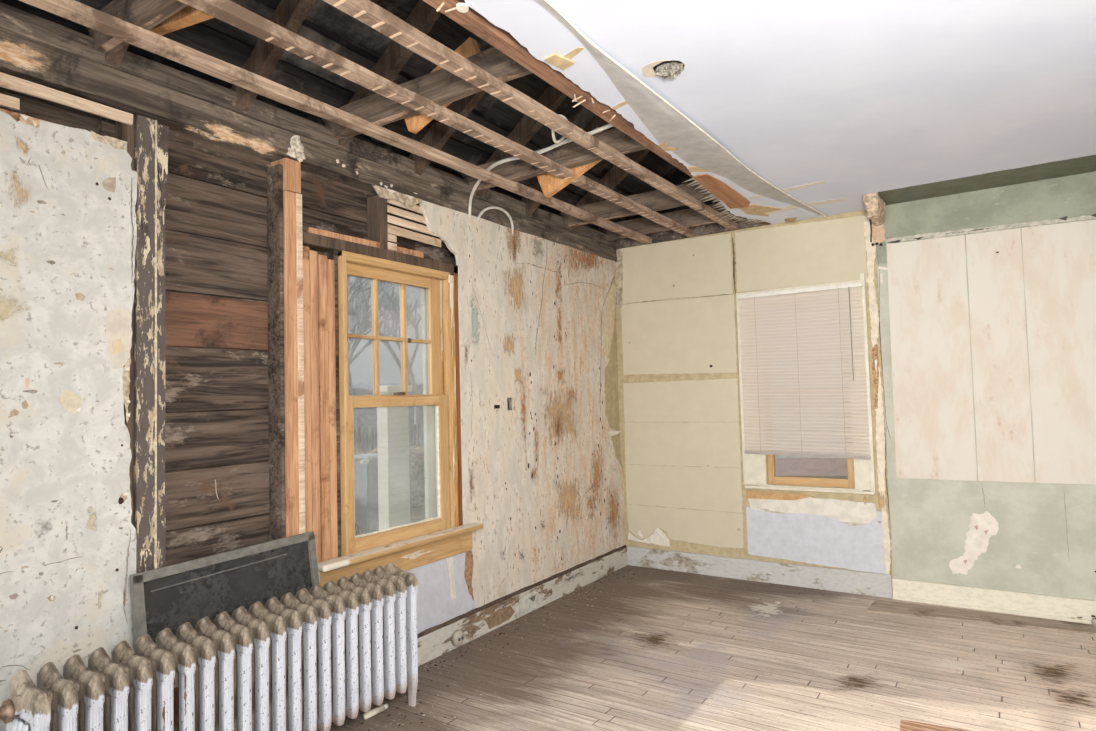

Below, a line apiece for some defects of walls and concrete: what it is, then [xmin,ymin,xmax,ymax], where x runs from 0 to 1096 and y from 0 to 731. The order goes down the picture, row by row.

water stain [541,389,576,439]
peeling [949,511,999,575]
spalling [445,549,474,601]
peeling [484,590,541,629]